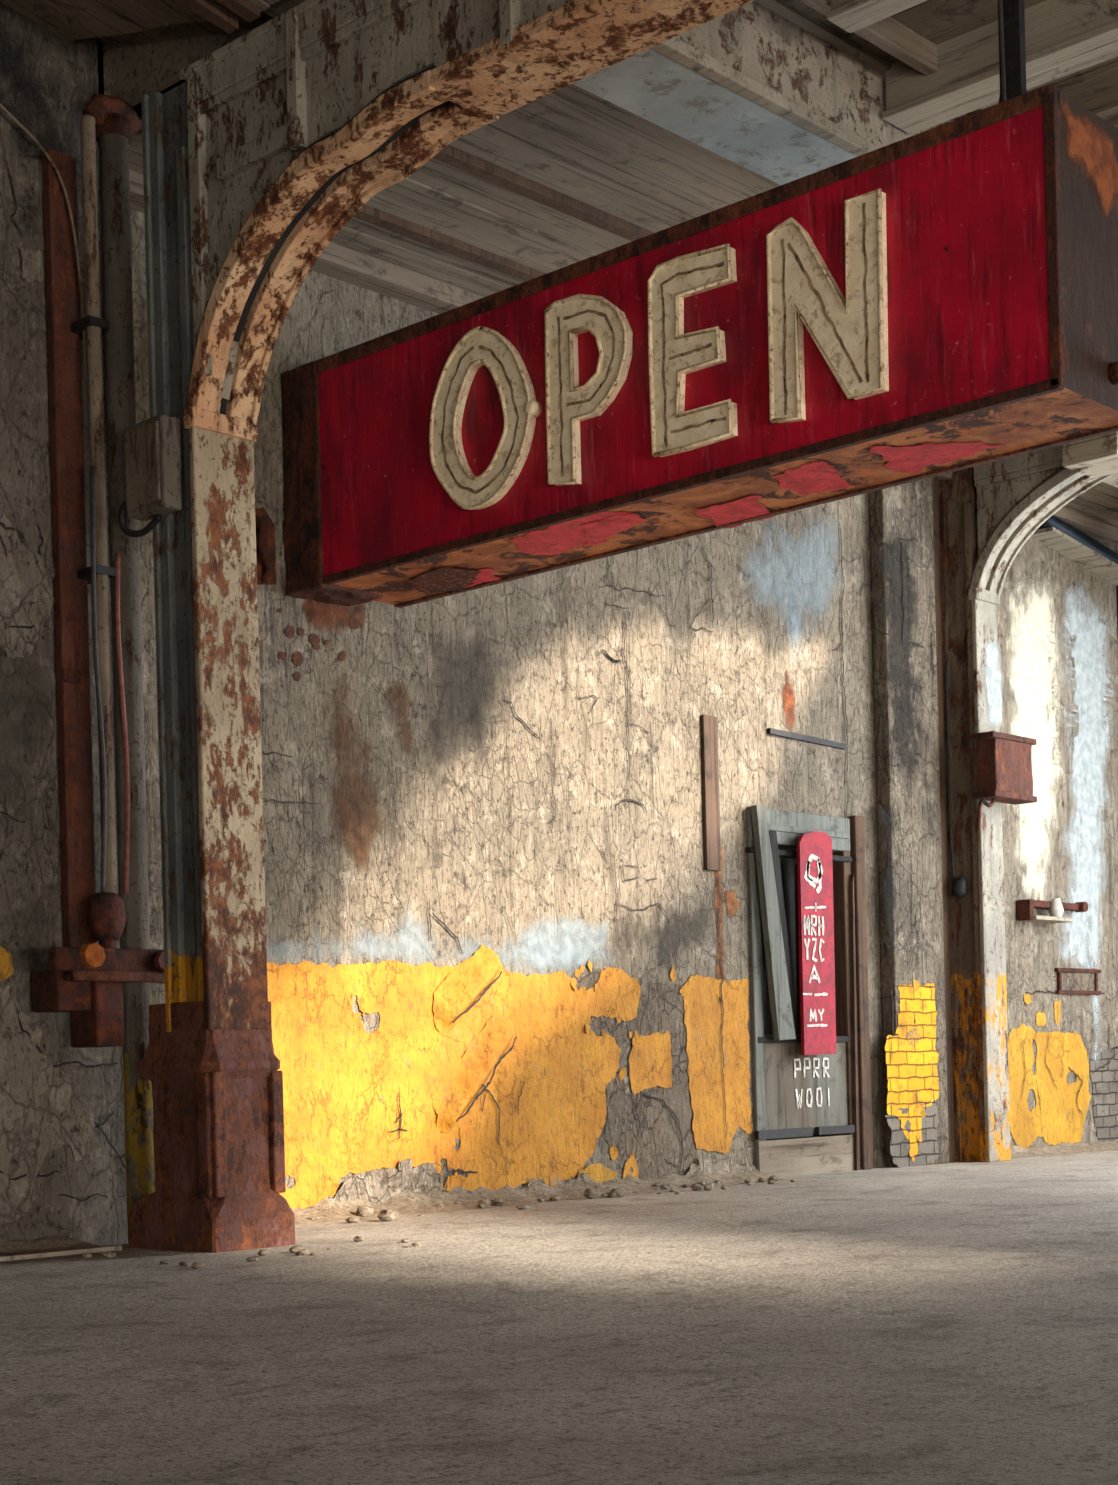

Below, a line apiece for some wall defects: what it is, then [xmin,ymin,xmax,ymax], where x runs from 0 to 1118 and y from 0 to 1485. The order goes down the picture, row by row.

water stain [881,539,922,774]
water stain [388,686,412,749]
water stain [335,682,378,866]
spalling [0,986,95,1228]
crack [0,1113,126,1201]
crack [18,1014,118,1068]
spalling [348,994,380,1033]
spalling [309,1133,470,1209]
crack [442,1081,524,1188]
crack [635,1091,683,1175]
peeling [571,960,753,1180]
flaking render [885,1100,941,1168]